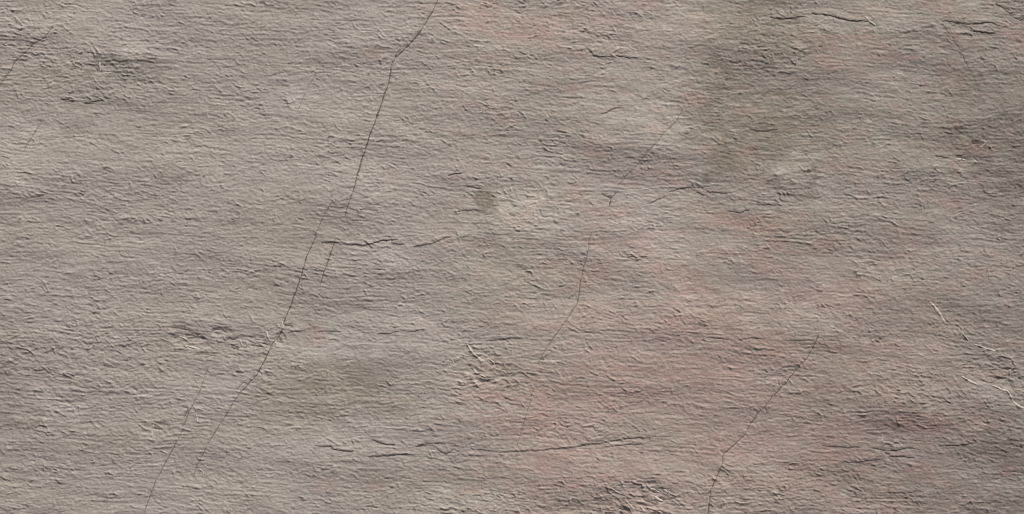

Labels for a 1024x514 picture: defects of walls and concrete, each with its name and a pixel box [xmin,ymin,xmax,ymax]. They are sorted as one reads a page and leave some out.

crack [193,0,450,476]
crack [316,232,672,457]
crack [601,106,685,206]
crack [708,332,820,514]